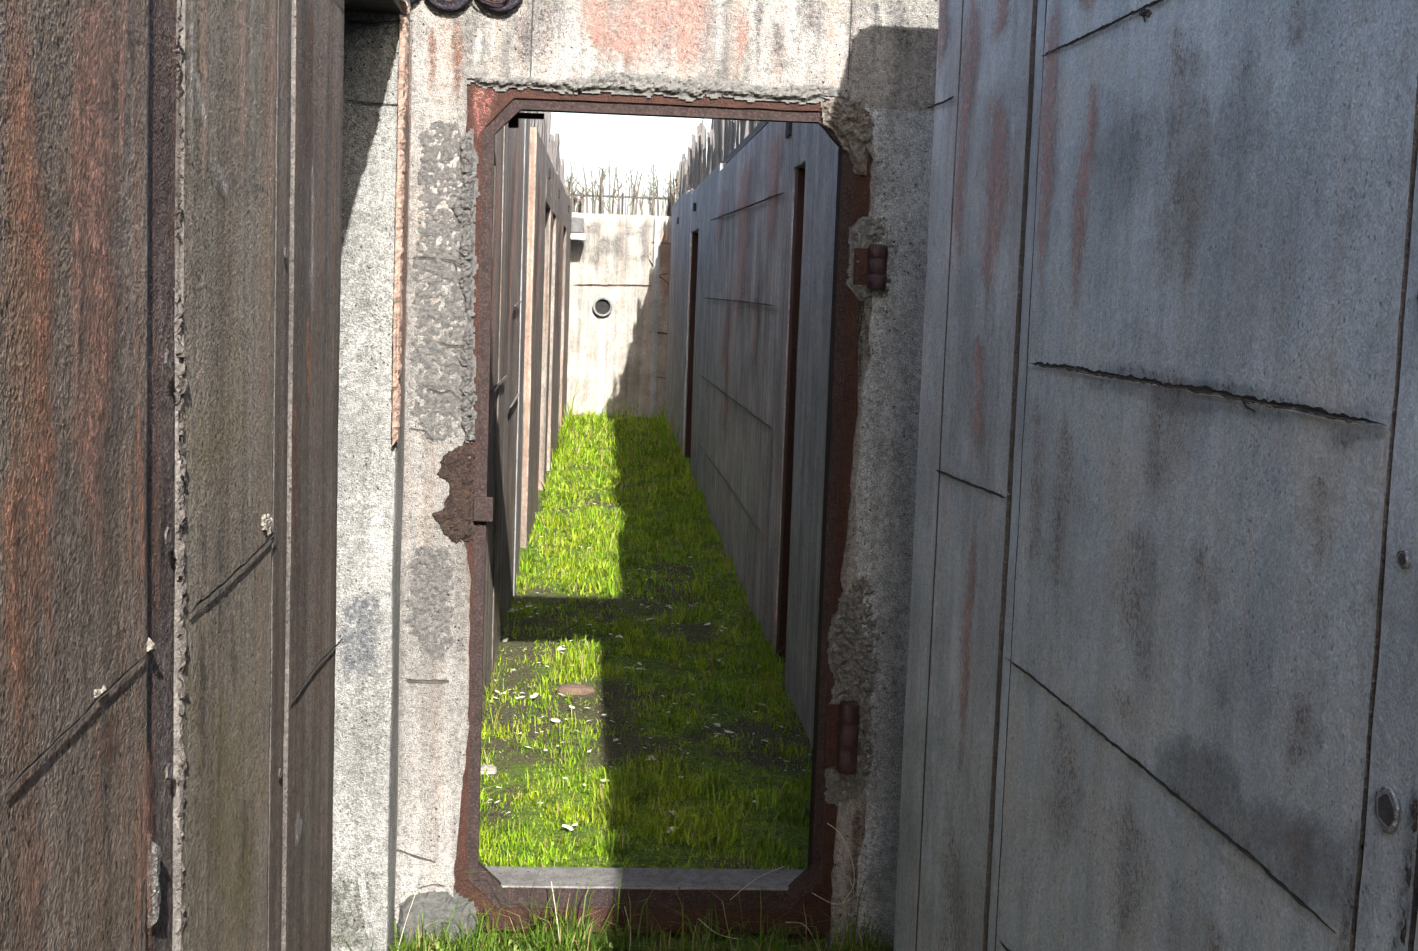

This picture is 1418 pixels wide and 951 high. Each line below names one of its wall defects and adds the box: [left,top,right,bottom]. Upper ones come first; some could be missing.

spalling [467,72,875,176]
corrosion [937,0,948,67]
corrosion [2,46,55,713]
corrosion [67,0,127,568]
spalling [432,129,480,544]
corrosion [488,144,518,450]
corrosion [660,234,671,304]
crack [1030,362,1386,426]
corrosion [128,409,161,611]
spalling [824,576,880,807]